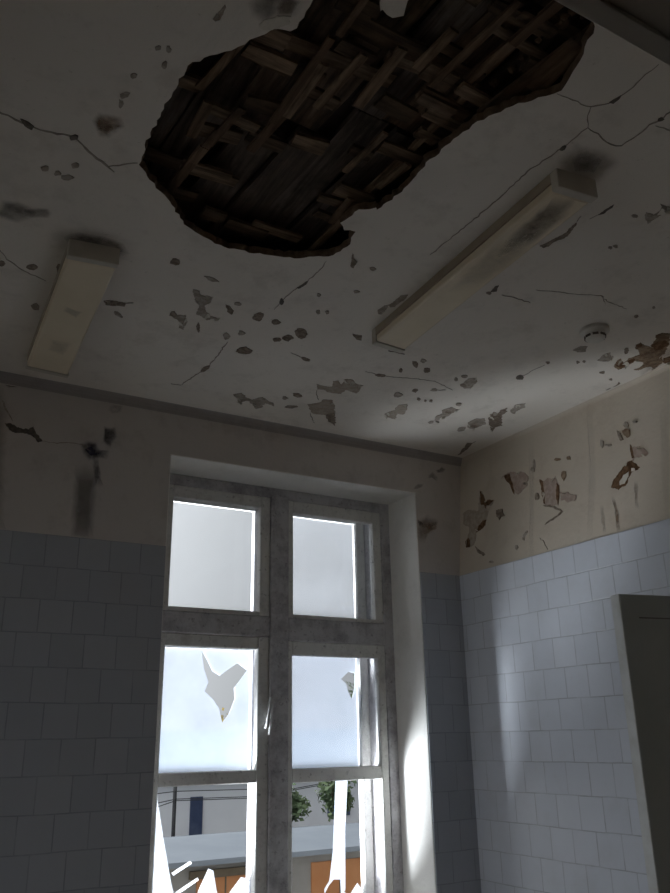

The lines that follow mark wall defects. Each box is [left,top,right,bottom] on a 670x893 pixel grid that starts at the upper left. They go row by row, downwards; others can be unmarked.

crack [0,112,137,172]
crack [430,64,670,255]
peeling [169,289,241,333]
peeling [252,312,281,325]
peeling [273,328,308,342]
crack [173,342,228,385]
crack [2,401,90,451]
peeling [233,379,363,426]
peeling [501,459,576,525]
peeling [463,491,505,563]